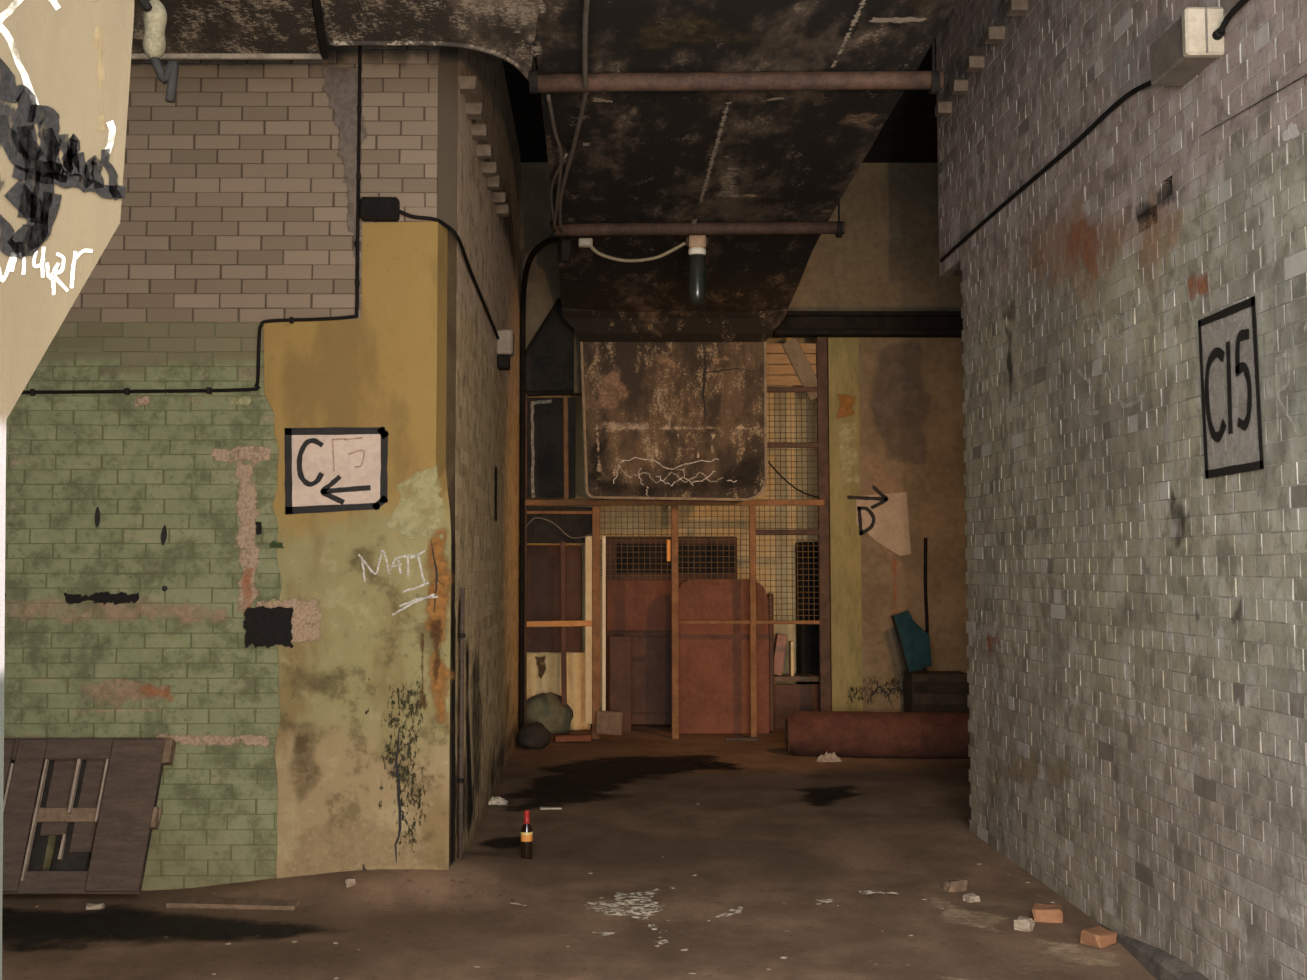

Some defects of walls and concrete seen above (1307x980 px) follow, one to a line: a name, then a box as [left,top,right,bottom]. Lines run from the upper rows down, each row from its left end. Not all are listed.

peeling [210,446,324,643]
corrosion [421,529,451,722]
leakage [365,681,433,860]